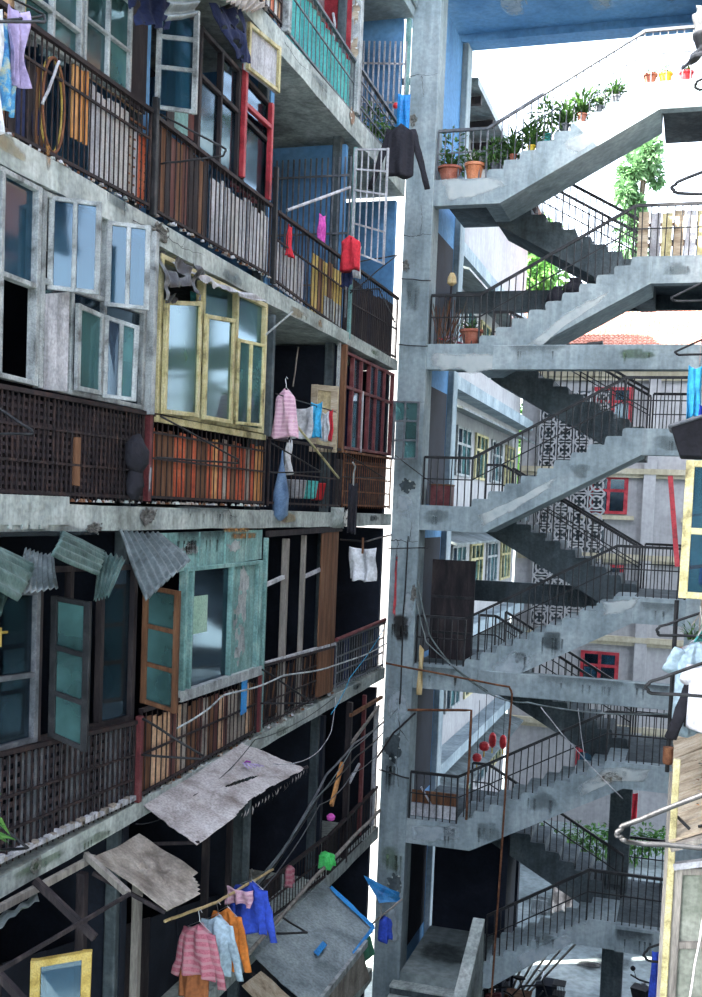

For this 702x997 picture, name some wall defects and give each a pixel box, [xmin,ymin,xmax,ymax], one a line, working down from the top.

leakage [424,944,463,963]